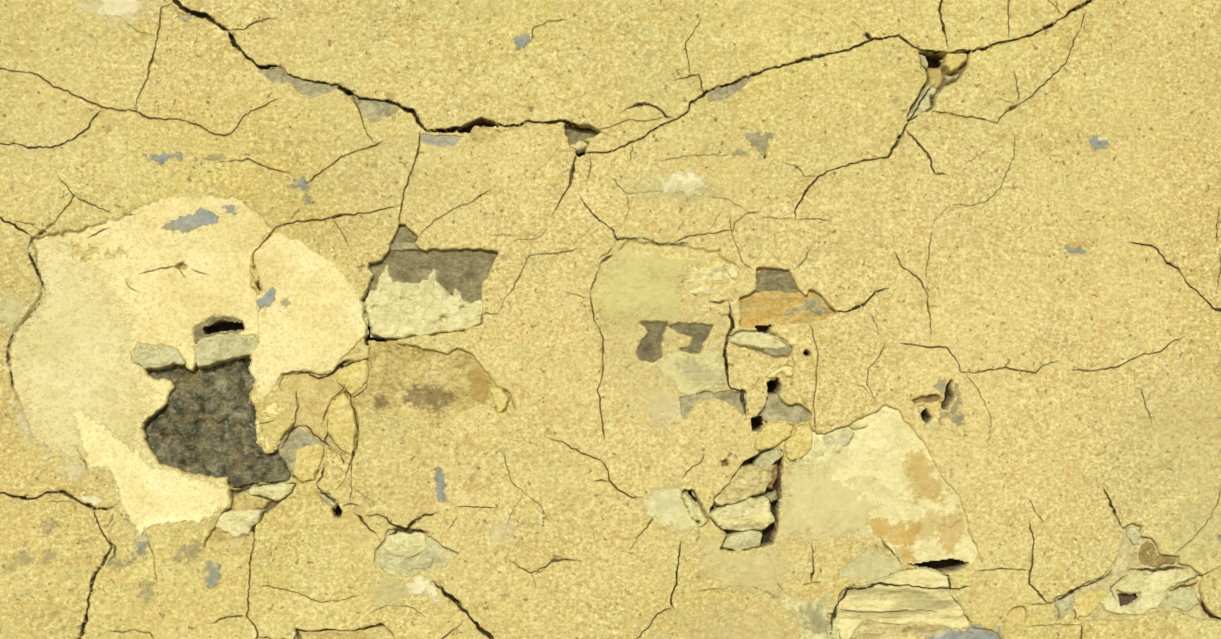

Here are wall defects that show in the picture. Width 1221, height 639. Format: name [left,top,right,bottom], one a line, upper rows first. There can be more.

spalling [907,53,967,121]
flaking render [0,194,510,555]
crack [0,0,1092,548]
flaking render [637,322,713,363]
crack [811,242,1181,425]
crack [1132,214,1221,312]
flaking render [680,366,978,569]
crack [0,491,154,639]
flaking render [375,529,458,577]
crack [435,583,493,639]
crack [717,489,1221,639]
flaking render [1050,523,1216,620]